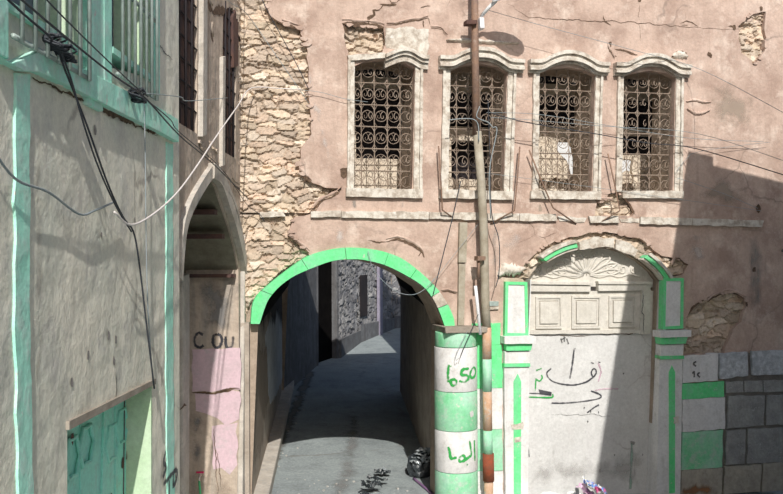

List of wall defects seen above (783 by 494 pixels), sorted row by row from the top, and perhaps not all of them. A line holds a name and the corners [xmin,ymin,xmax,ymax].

spalling [343,23,430,55]
crack [342,0,447,43]
spalling [733,6,767,65]
spalling [231,0,340,311]
spalling [502,231,685,278]
spalling [684,290,749,354]
crack [180,388,240,410]
crack [213,437,221,486]